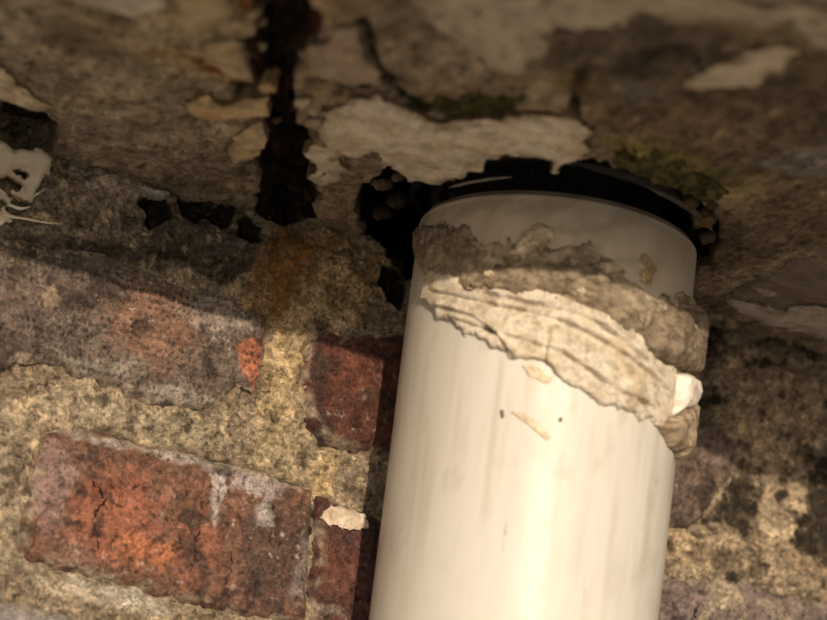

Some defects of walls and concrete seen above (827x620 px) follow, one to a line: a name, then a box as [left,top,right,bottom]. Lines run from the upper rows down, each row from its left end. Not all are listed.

peeling [0,64,52,123]
peeling [85,0,171,16]
peeling [186,2,279,163]
crack [244,0,326,225]
crack [358,17,380,58]
crack [358,74,411,97]
peeling [302,91,595,186]
peeling [412,0,827,90]
peeling [0,140,60,225]